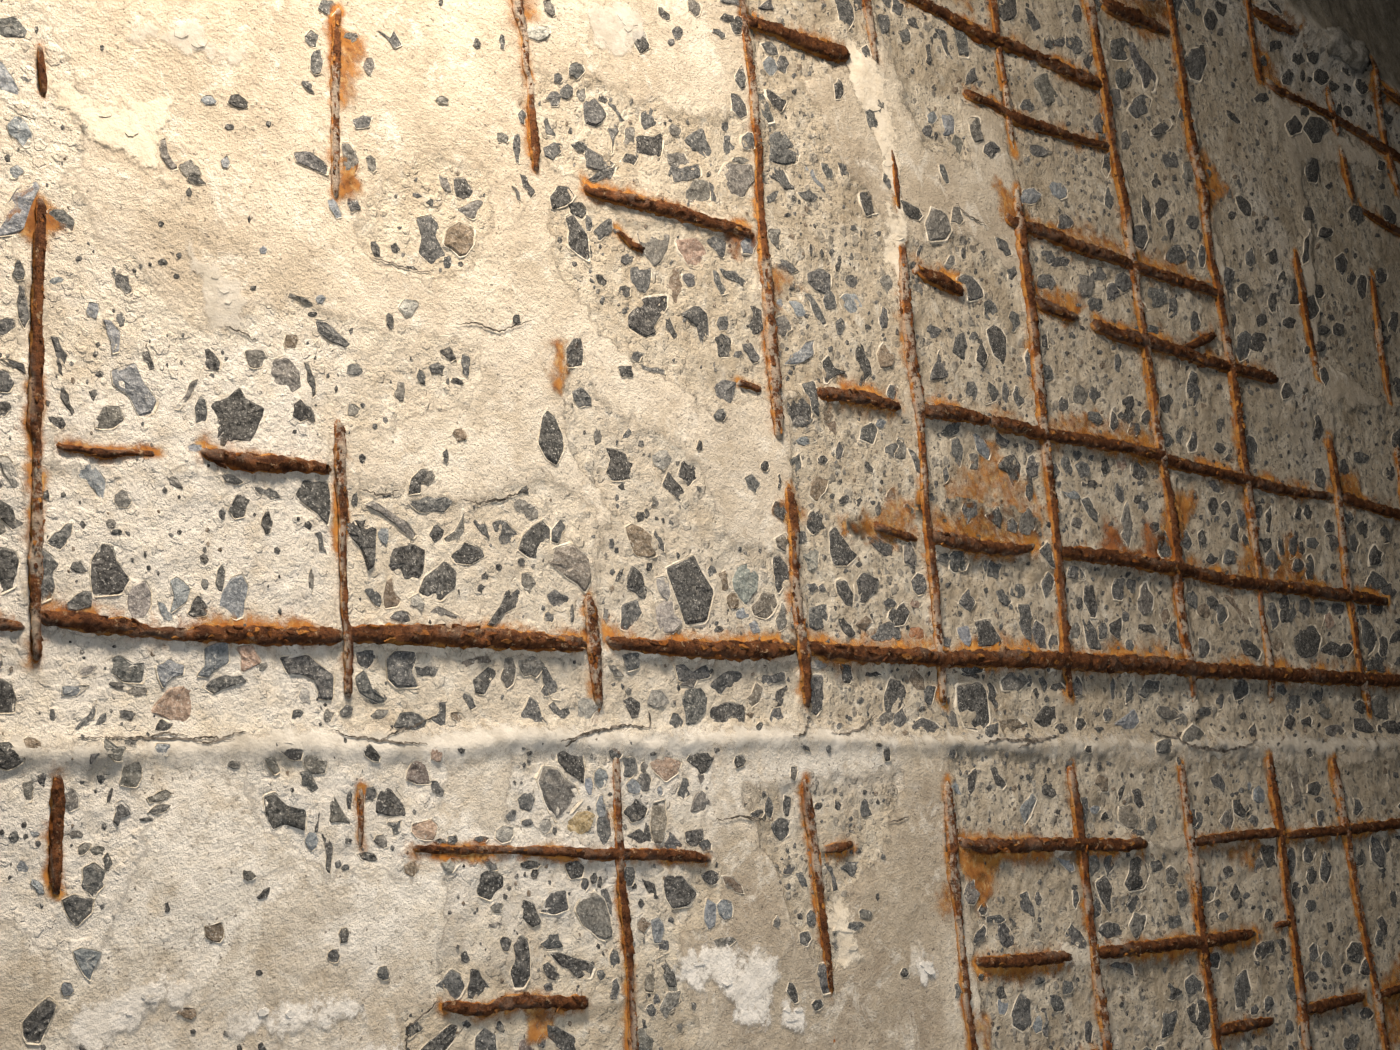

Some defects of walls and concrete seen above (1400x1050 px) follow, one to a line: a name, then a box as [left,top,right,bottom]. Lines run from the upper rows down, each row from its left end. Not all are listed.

corrosion [328,4,365,106]
spalling [719,12,743,36]
spalling [178,158,206,185]
corrosion [331,165,361,201]
spalling [617,366,634,378]
spalling [537,407,565,466]
corrosion [841,431,1053,561]
corrosion [1102,491,1326,615]
corrosion [807,630,1039,673]
corrosion [944,816,1054,907]
spalling [1266,748,1400,1050]
spalling [22,982,75,1050]